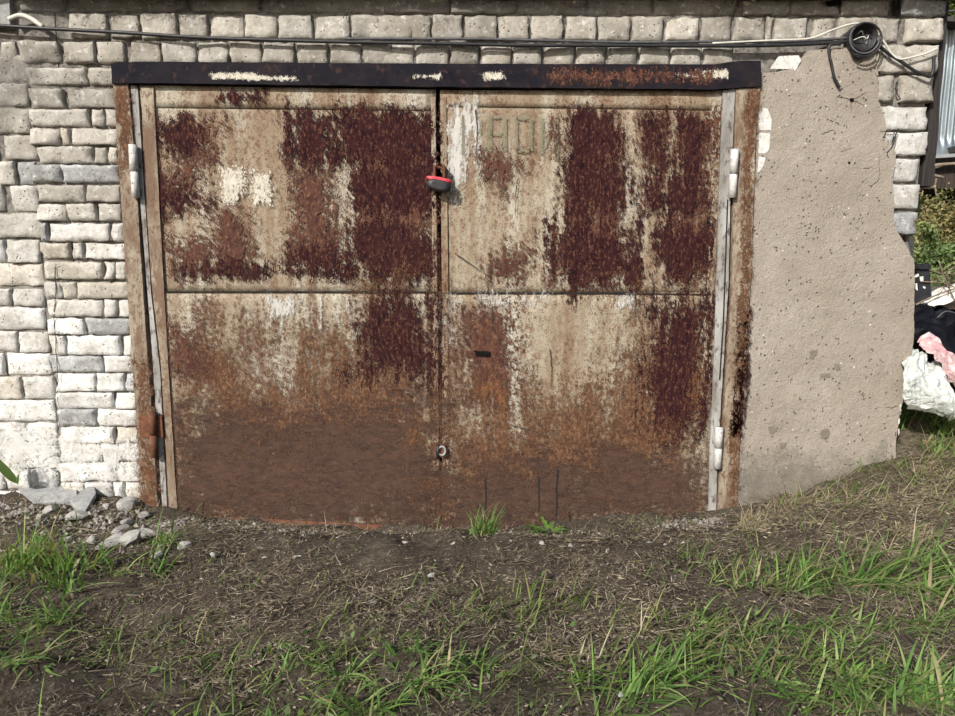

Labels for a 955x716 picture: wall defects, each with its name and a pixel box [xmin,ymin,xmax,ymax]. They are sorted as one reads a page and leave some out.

rust [542,65,719,89]
flaking render [770,55,801,69]
flaking render [758,108,772,172]
rust [727,87,762,507]
rust [128,356,163,507]